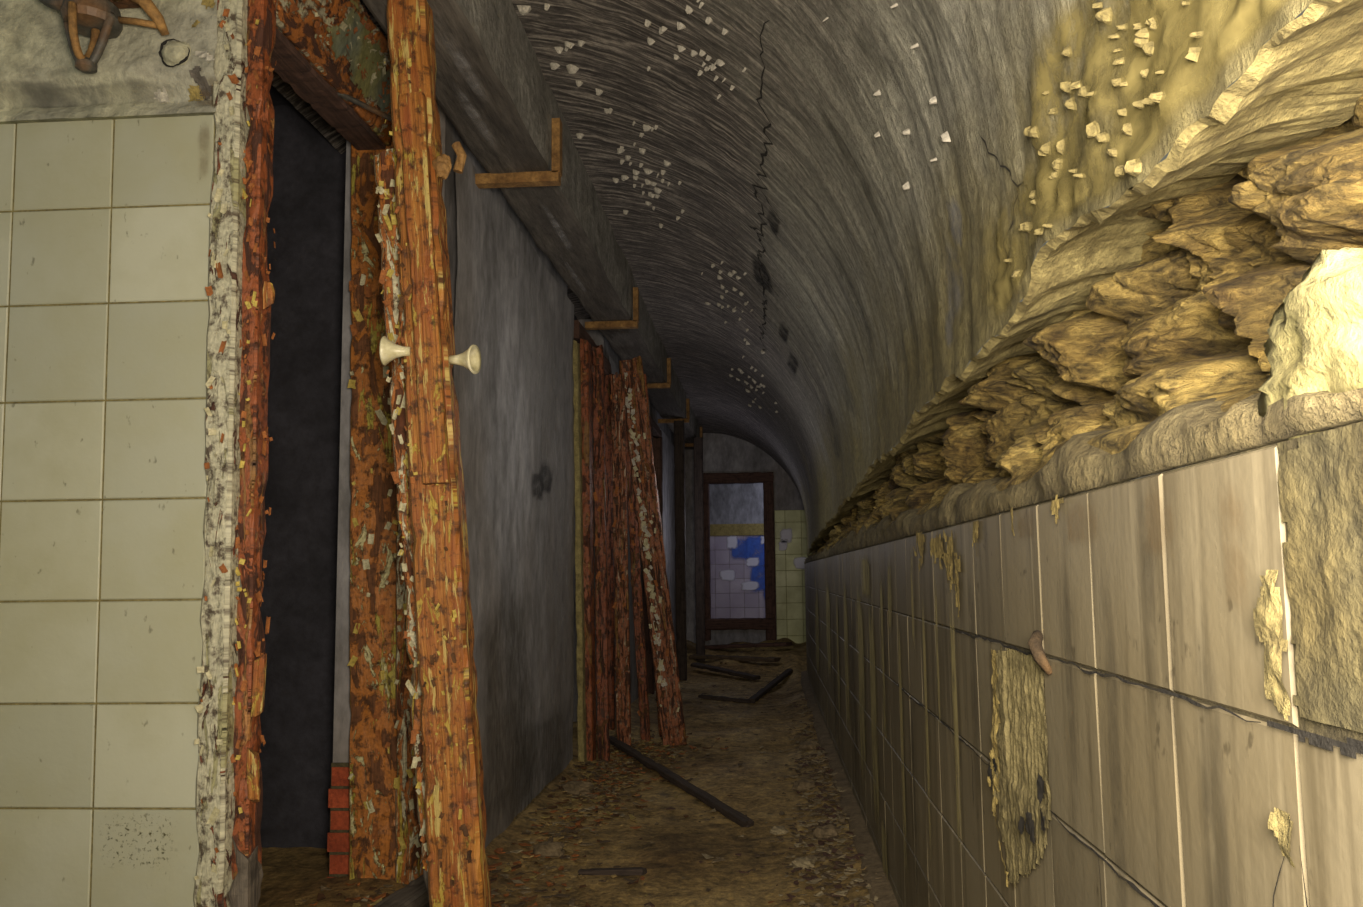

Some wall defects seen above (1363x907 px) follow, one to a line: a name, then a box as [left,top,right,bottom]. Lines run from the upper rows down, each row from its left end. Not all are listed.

peeling [188,0,277,126]
crack [737,20,789,350]
spalling [779,0,1363,569]
peeling [218,320,275,468]
peeling [275,0,472,886]
peeling [204,495,271,710]
spalling [987,630,1052,887]
crack [946,626,1261,723]
crack [1049,810,1160,907]
spalling [1268,807,1295,868]
crack [1273,847,1308,907]
spalling [1253,422,1363,759]